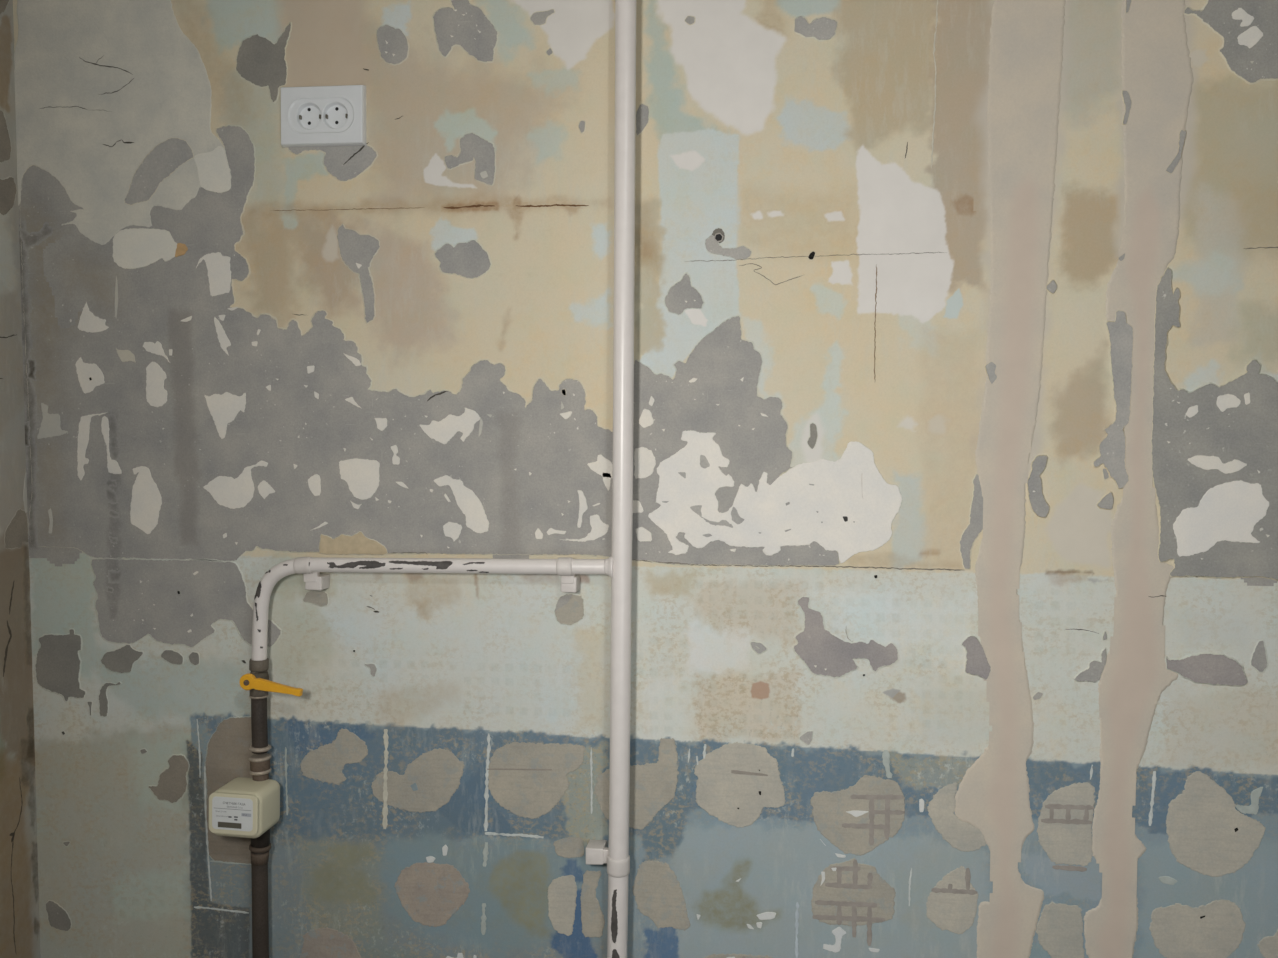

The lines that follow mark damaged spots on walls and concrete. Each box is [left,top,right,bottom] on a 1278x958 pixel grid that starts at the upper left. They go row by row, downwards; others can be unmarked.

peeling [1184,0,1278,85]
peeling [0,107,83,224]
corrosion [242,185,614,243]
peeling [28,124,613,717]
peeling [632,315,840,567]
peeling [1151,267,1278,581]
crack [3,582,14,677]
peeling [148,716,254,865]
peeling [426,845,448,863]
peeling [611,889,620,958]
peeling [747,912,776,929]